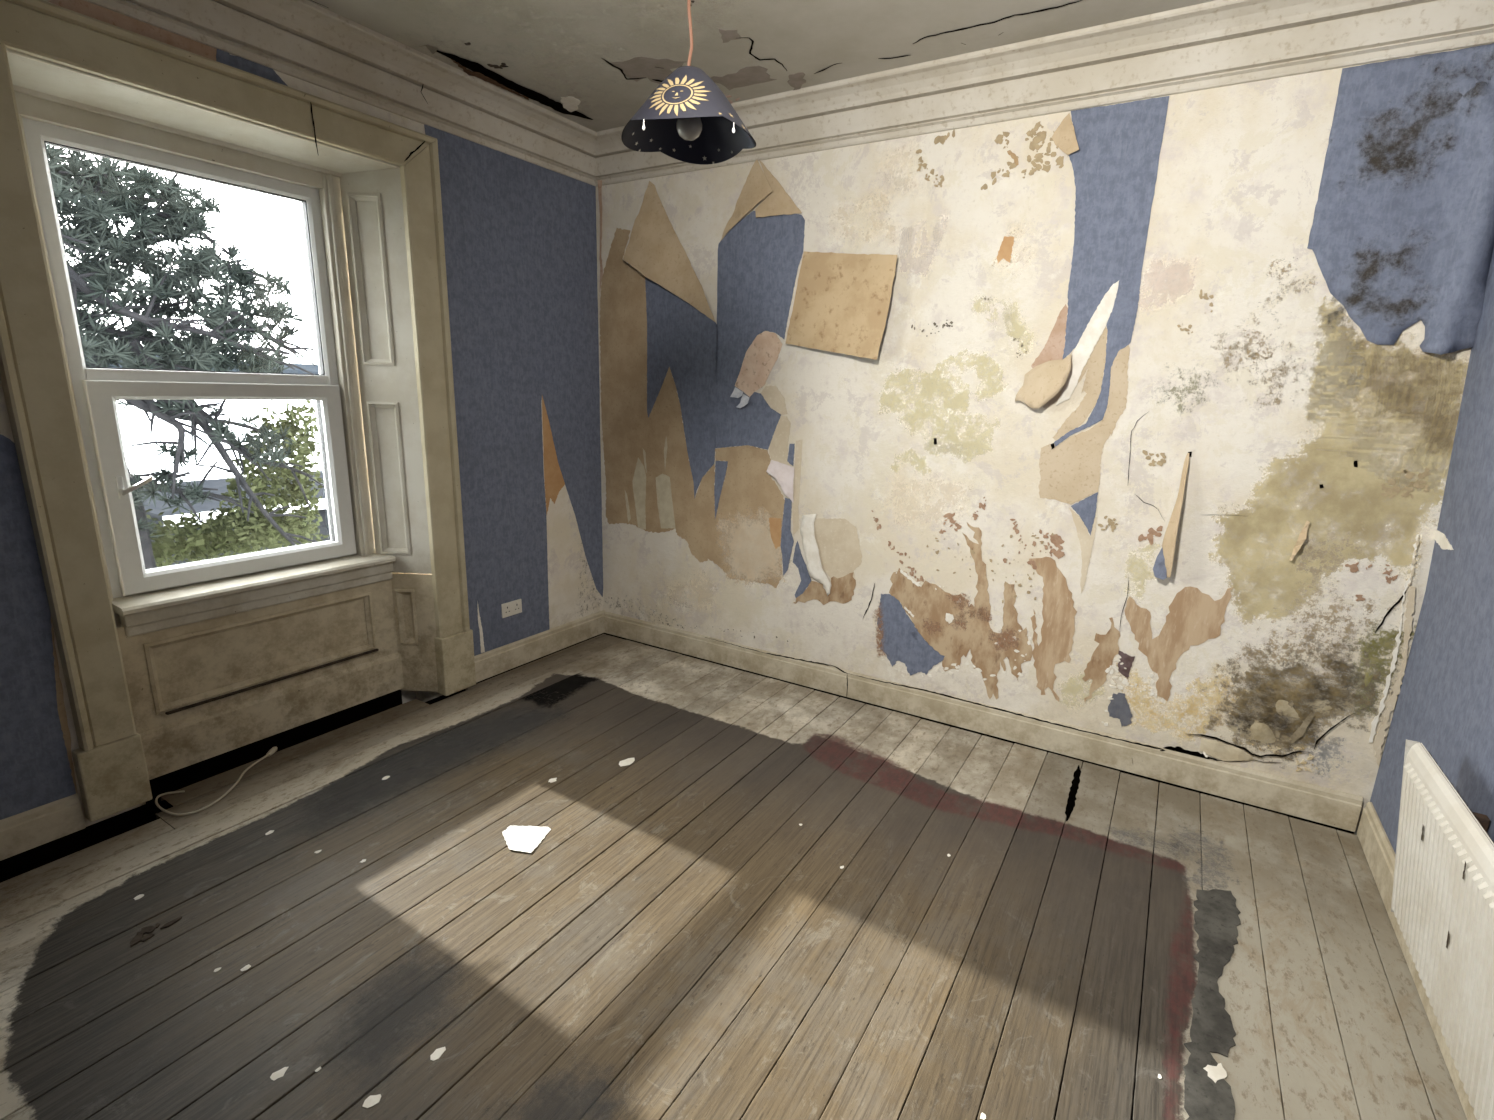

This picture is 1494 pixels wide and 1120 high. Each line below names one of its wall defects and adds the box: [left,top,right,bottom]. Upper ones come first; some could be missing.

peeling [602,57,686,84]
peeling [711,66,806,103]
leakage [1359,56,1493,178]
peeling [1142,450,1166,467]
peeling [871,497,1065,610]
peeling [1098,516,1118,532]
peeling [1138,526,1163,545]
leakage [1058,234,1468,775]
flaking render [881,628,1032,680]
peeling [1102,654,1157,726]
crack [1189,713,1354,763]